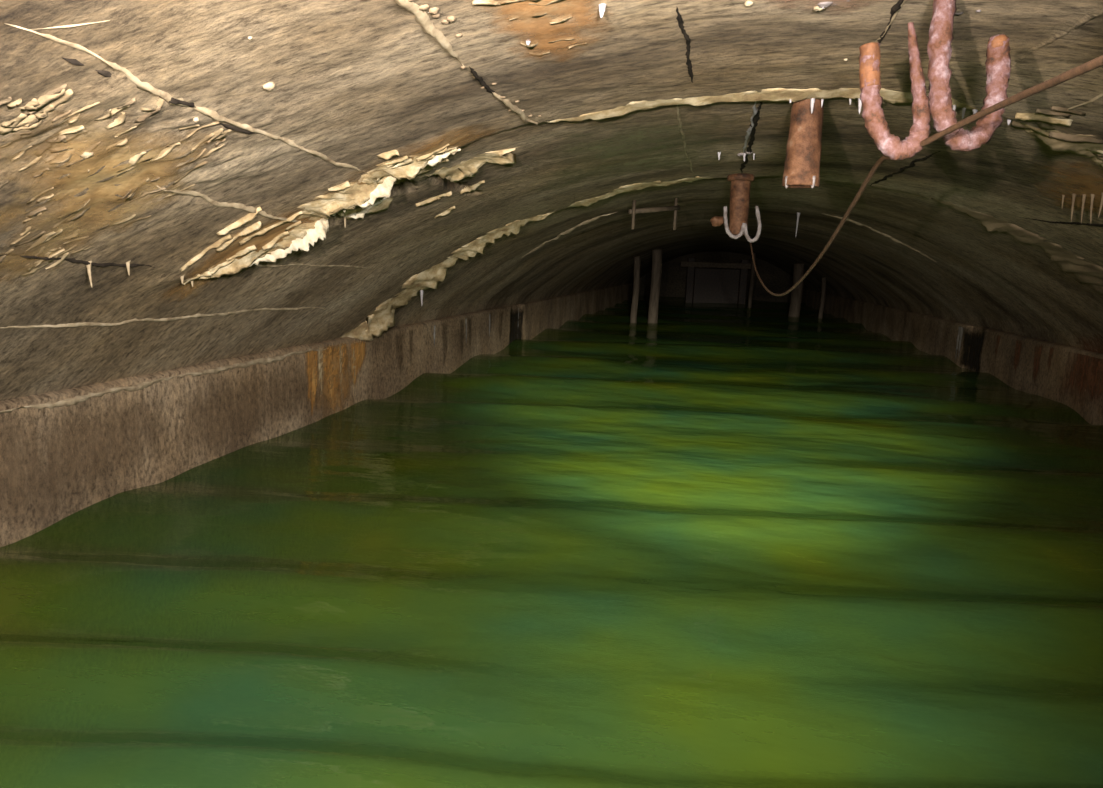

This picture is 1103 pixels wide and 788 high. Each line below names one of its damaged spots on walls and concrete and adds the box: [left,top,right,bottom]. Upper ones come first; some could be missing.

peeling [0,187,96,280]
peeling [0,84,234,228]
crack [3,20,368,174]
spalling [180,144,518,287]
crack [395,0,542,125]
crack [676,8,693,83]
rust [307,341,365,412]